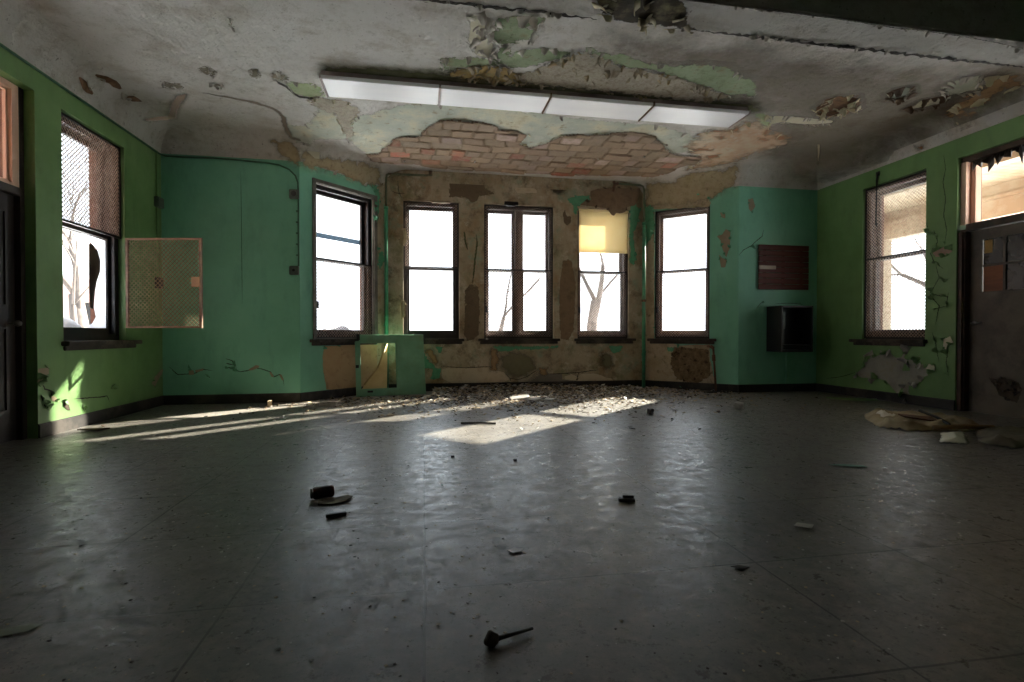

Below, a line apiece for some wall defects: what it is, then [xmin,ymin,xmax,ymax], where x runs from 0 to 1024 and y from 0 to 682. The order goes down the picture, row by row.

flaking render [592,0,695,35]
flaking render [439,11,757,104]
peeling [767,95,862,127]
peeling [885,75,984,114]
flaking render [248,69,731,390]
crack [923,159,949,375]
peeling [36,365,70,410]
crack [172,359,284,383]
peeling [853,344,935,402]
peeling [989,377,1022,403]